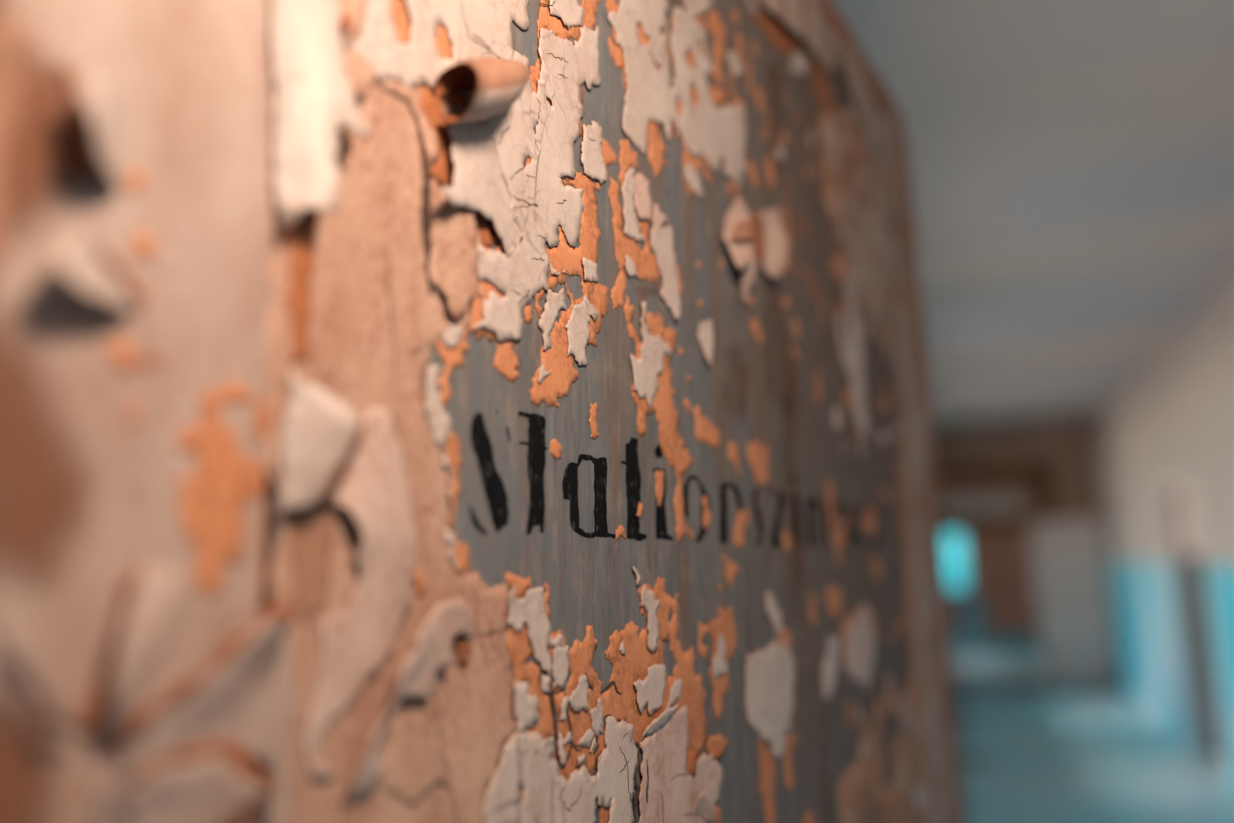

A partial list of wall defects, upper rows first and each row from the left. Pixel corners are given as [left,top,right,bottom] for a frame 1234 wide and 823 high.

crack [461,0,513,60]
crack [420,159,438,295]
crack [499,98,569,266]
peeling [177,0,964,823]
crack [438,662,715,823]